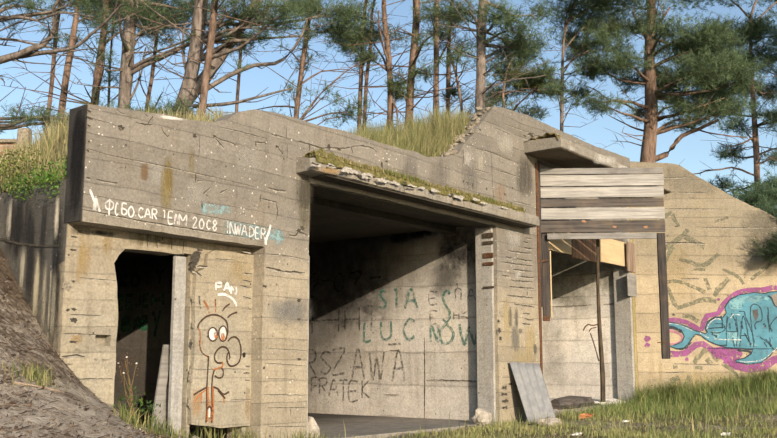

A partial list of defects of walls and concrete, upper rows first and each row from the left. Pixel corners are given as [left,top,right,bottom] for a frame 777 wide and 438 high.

crack [82,127,377,311]